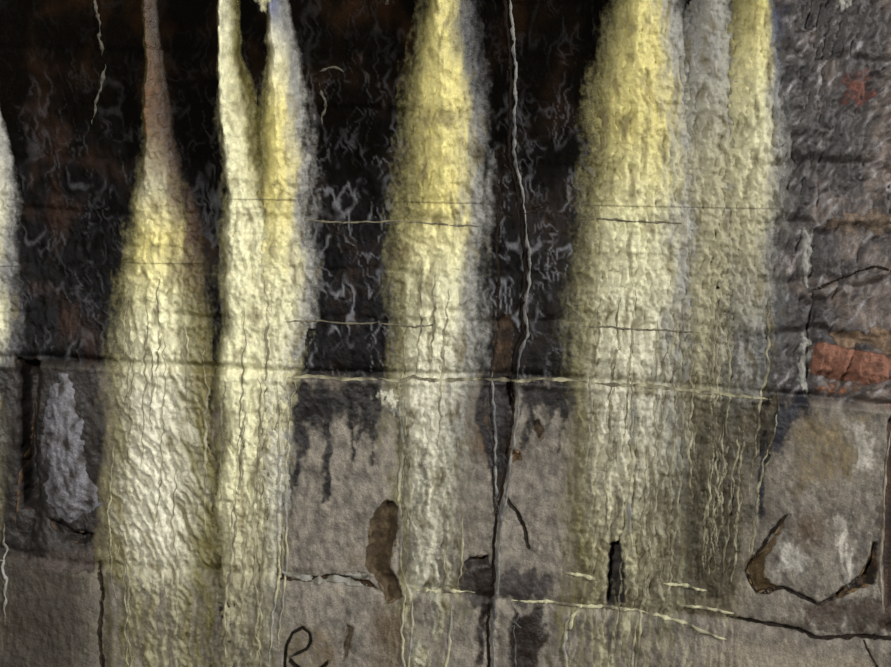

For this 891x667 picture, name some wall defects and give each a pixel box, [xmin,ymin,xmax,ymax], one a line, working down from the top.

damp [0,0,553,667]
crack [486,0,548,667]
damp [520,0,891,667]
spalling [365,500,403,604]
spalling [745,522,784,593]
crack [746,515,873,606]
spalling [834,542,878,598]
crack [735,617,891,667]